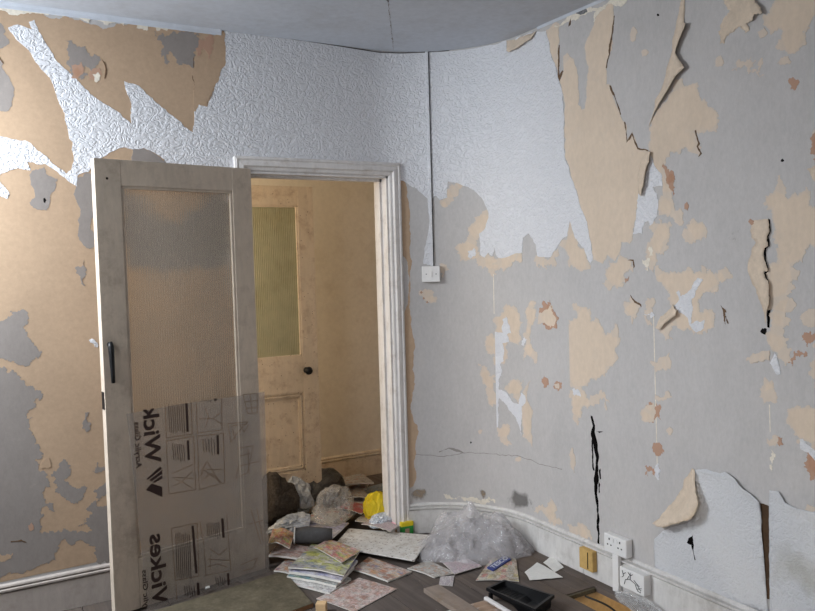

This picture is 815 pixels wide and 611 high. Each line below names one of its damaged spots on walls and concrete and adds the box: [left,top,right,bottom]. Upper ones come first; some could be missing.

peeling [0,58,14,112]
peeling [66,40,107,82]
peeling [137,25,205,85]
peeling [648,0,685,127]
peeling [131,148,166,163]
peeling [29,167,57,210]
peeling [73,173,95,249]
peeling [747,219,770,324]
peeling [0,309,110,578]
crack [416,448,562,470]
crack [591,416,603,544]
peeling [652,469,698,528]